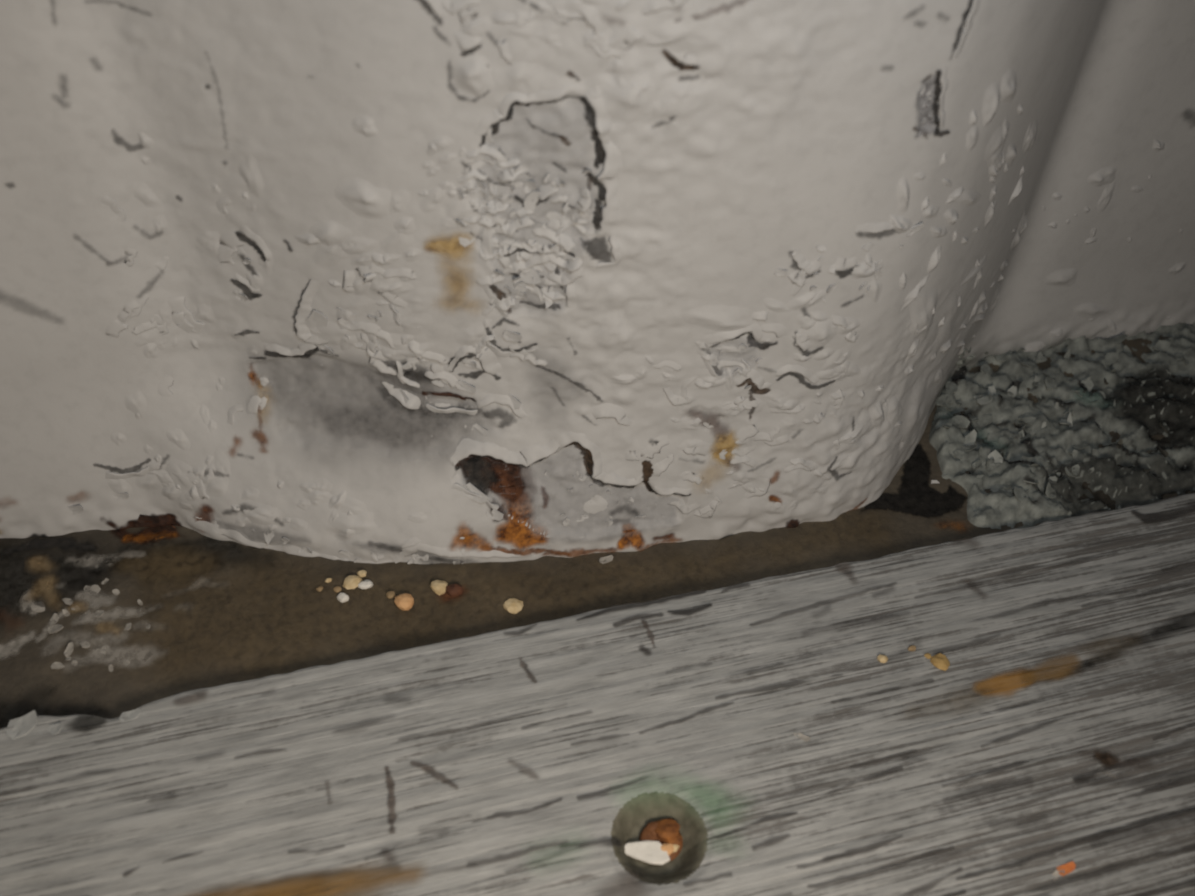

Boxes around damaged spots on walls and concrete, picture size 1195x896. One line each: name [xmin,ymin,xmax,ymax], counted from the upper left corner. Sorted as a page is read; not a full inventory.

peeling [914,67,950,136]
peeling [231,225,271,301]
peeling [239,279,382,359]
corrosion [428,238,467,257]
peeling [381,72,692,527]
corrosion [453,498,679,557]
water stain [0,538,274,619]
water stain [0,702,102,729]